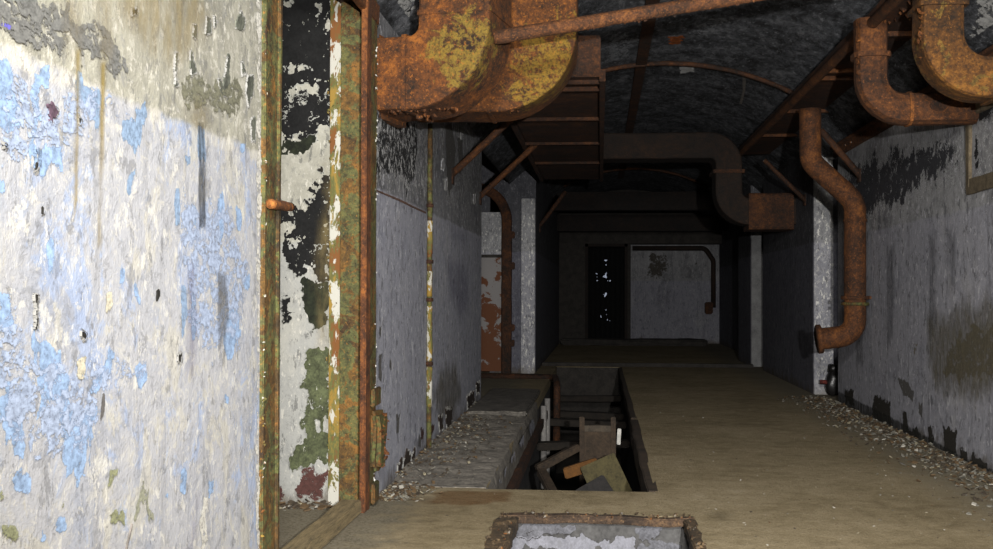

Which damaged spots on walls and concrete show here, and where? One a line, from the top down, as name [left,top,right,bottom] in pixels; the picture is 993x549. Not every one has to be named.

peeling [0,0,131,81]
peeling [0,59,147,195]
peeling [173,0,262,400]
peeling [280,166,330,332]
peeling [281,0,330,155]
peeling [0,292,148,494]
peeling [279,347,334,512]
peeling [199,479,214,549]